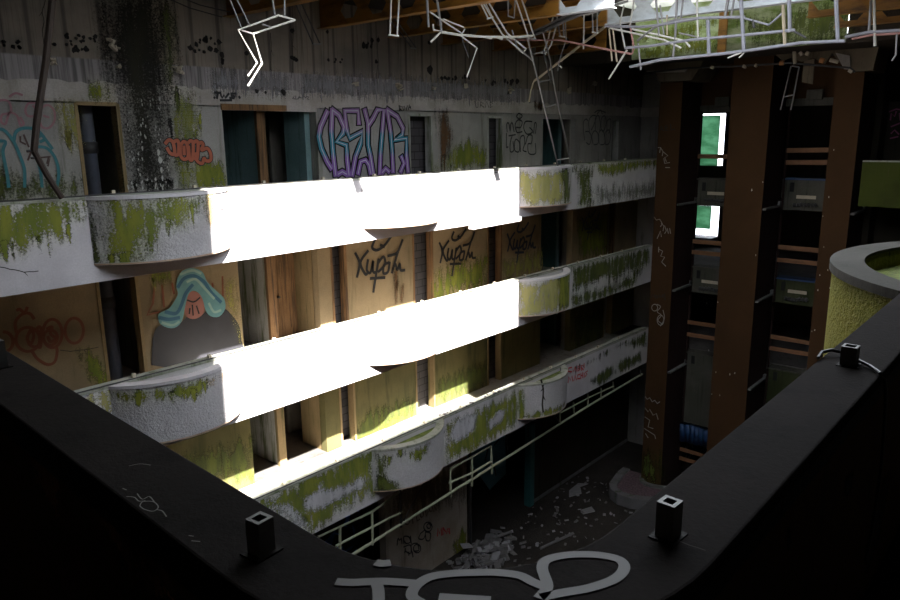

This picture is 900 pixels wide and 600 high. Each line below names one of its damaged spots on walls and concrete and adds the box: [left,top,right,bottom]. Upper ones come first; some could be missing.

leakage [96,0,189,192]
leakage [552,168,570,205]
leakage [0,240,15,262]
leakage [82,200,131,263]
crack [538,379,546,413]
leakage [374,449,422,491]
leakage [385,464,469,527]